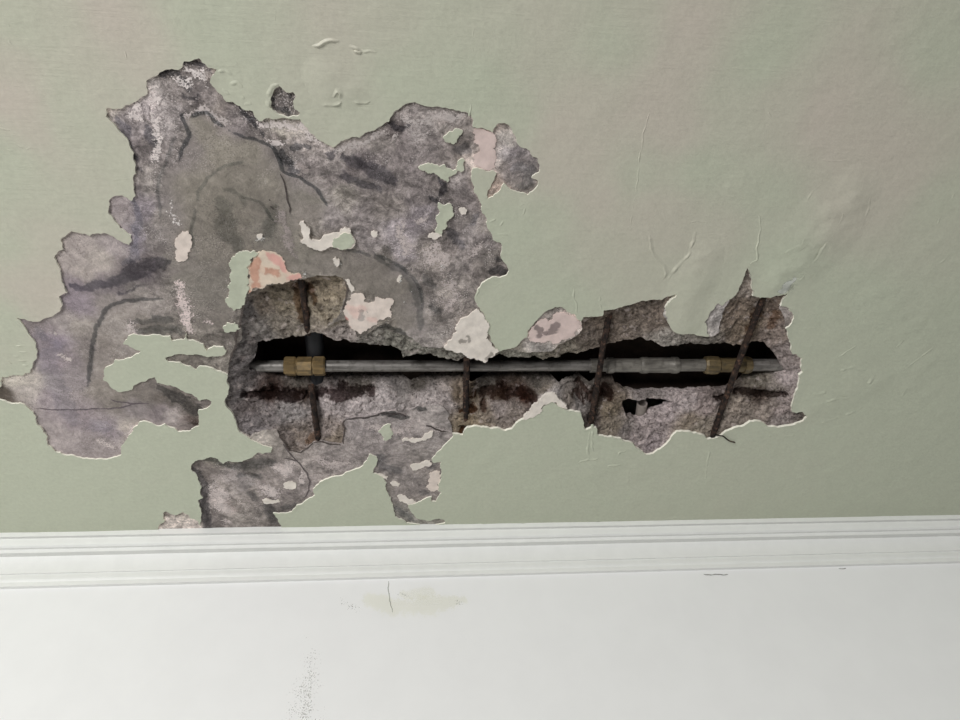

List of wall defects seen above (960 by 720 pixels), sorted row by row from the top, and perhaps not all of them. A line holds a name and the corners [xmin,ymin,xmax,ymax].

peeling [0,58,806,529]
corrosion [459,380,537,413]
corrosion [571,376,614,405]
corrosion [713,387,788,401]